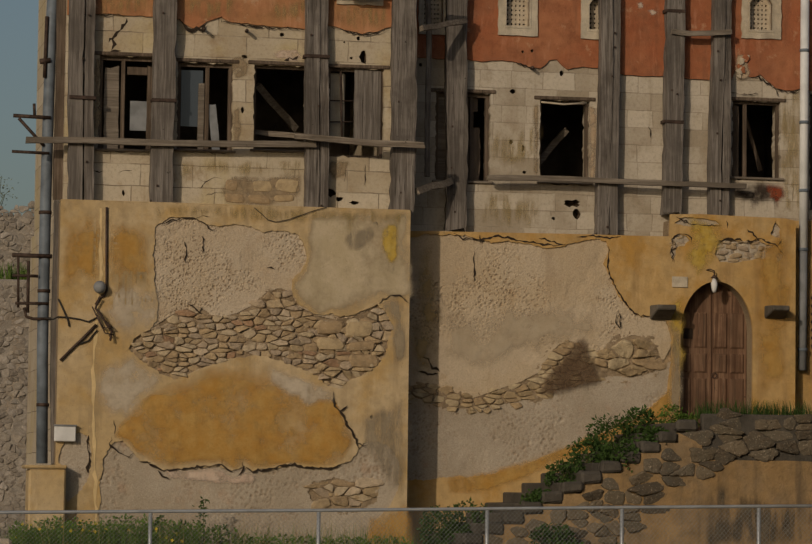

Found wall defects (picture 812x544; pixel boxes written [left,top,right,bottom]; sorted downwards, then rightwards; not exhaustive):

crack [95,14,128,52]
spalling [669,217,718,261]
spalling [715,223,780,263]
spalling [98,217,672,544]
peeling [58,433,91,502]
crack [84,435,92,473]
crack [109,392,366,479]